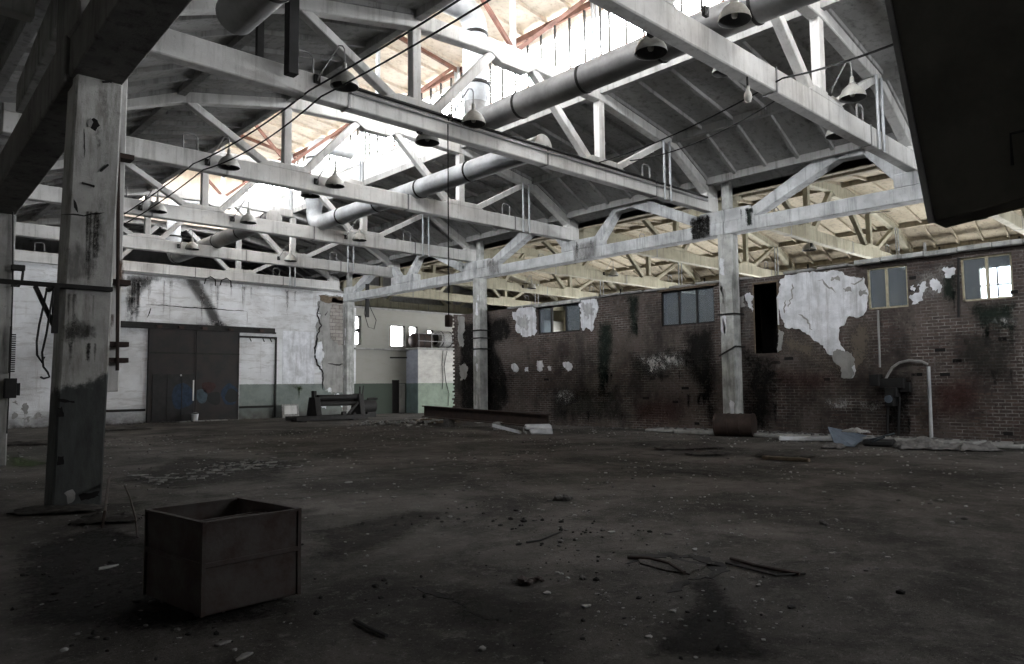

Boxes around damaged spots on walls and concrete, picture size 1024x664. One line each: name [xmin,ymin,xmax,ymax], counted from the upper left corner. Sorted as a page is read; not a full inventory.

hole [87,118,100,131]
damp [86,212,101,262]
mould [690,215,710,239]
damp [64,321,96,358]
flaking render [314,294,346,410]
flaking render [512,306,537,337]
flaking render [579,299,599,332]
flaking render [740,292,754,312]
flaking render [772,270,869,381]
flaking render [909,264,956,304]
damp [553,323,625,421]